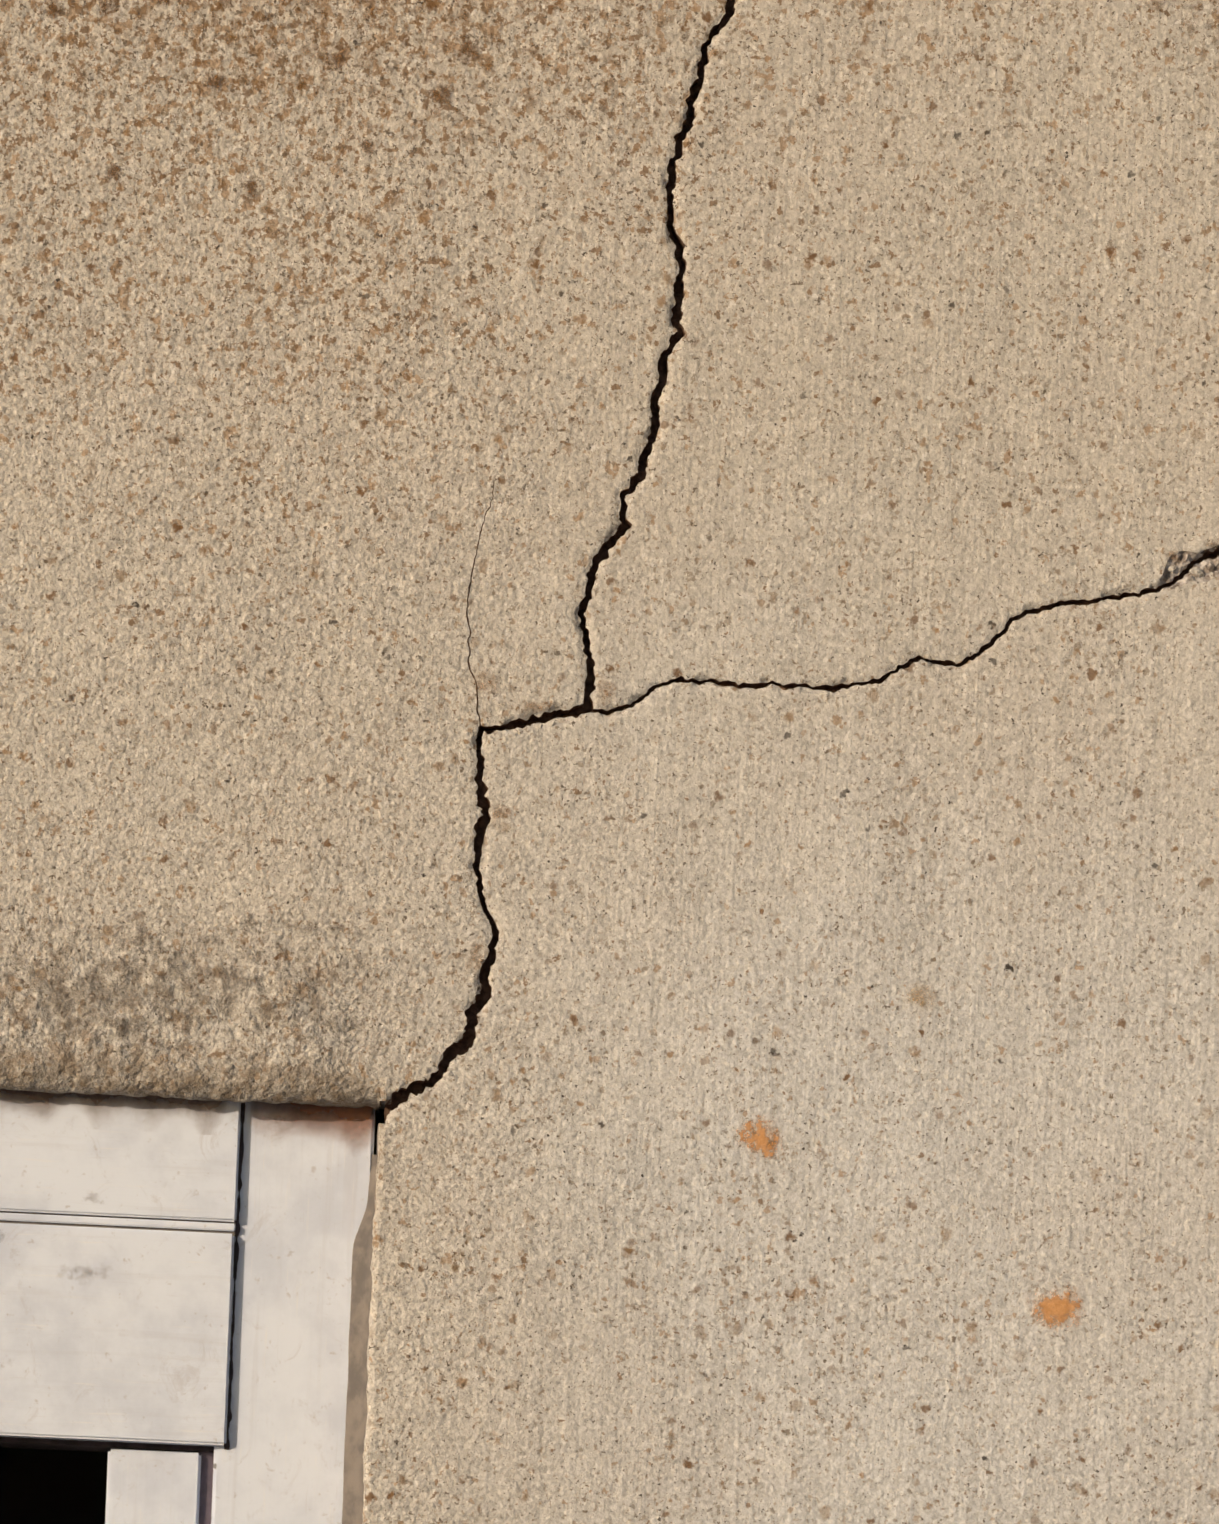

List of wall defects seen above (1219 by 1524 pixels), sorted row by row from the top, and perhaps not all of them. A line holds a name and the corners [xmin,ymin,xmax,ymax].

crack [384,0,1219,1121]
rust [737,1116,779,1157]
rust [1033,1292,1082,1329]